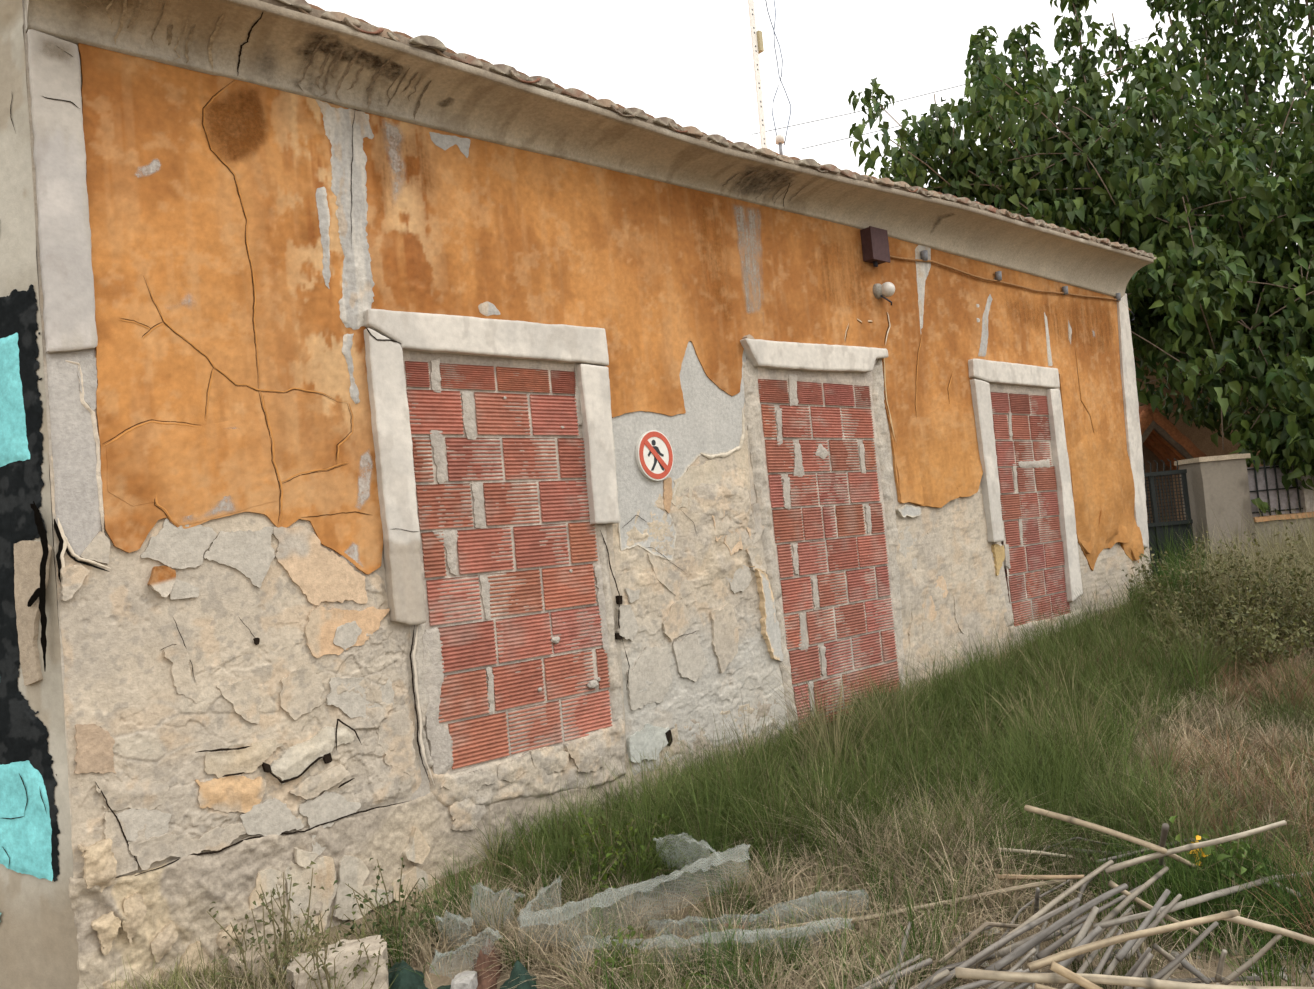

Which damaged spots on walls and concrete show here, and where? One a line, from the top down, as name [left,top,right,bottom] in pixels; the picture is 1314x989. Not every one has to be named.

damp [206,92,264,160]
crack [104,12,419,532]
peeling [315,99,402,404]
damp [297,35,431,119]
flaking render [14,348,440,942]
crack [95,616,434,876]
flaking render [596,334,798,775]
flaking render [872,359,1014,691]
flaking render [1078,542,1150,616]
flaking render [91,893,147,956]
flaking render [147,920,243,989]